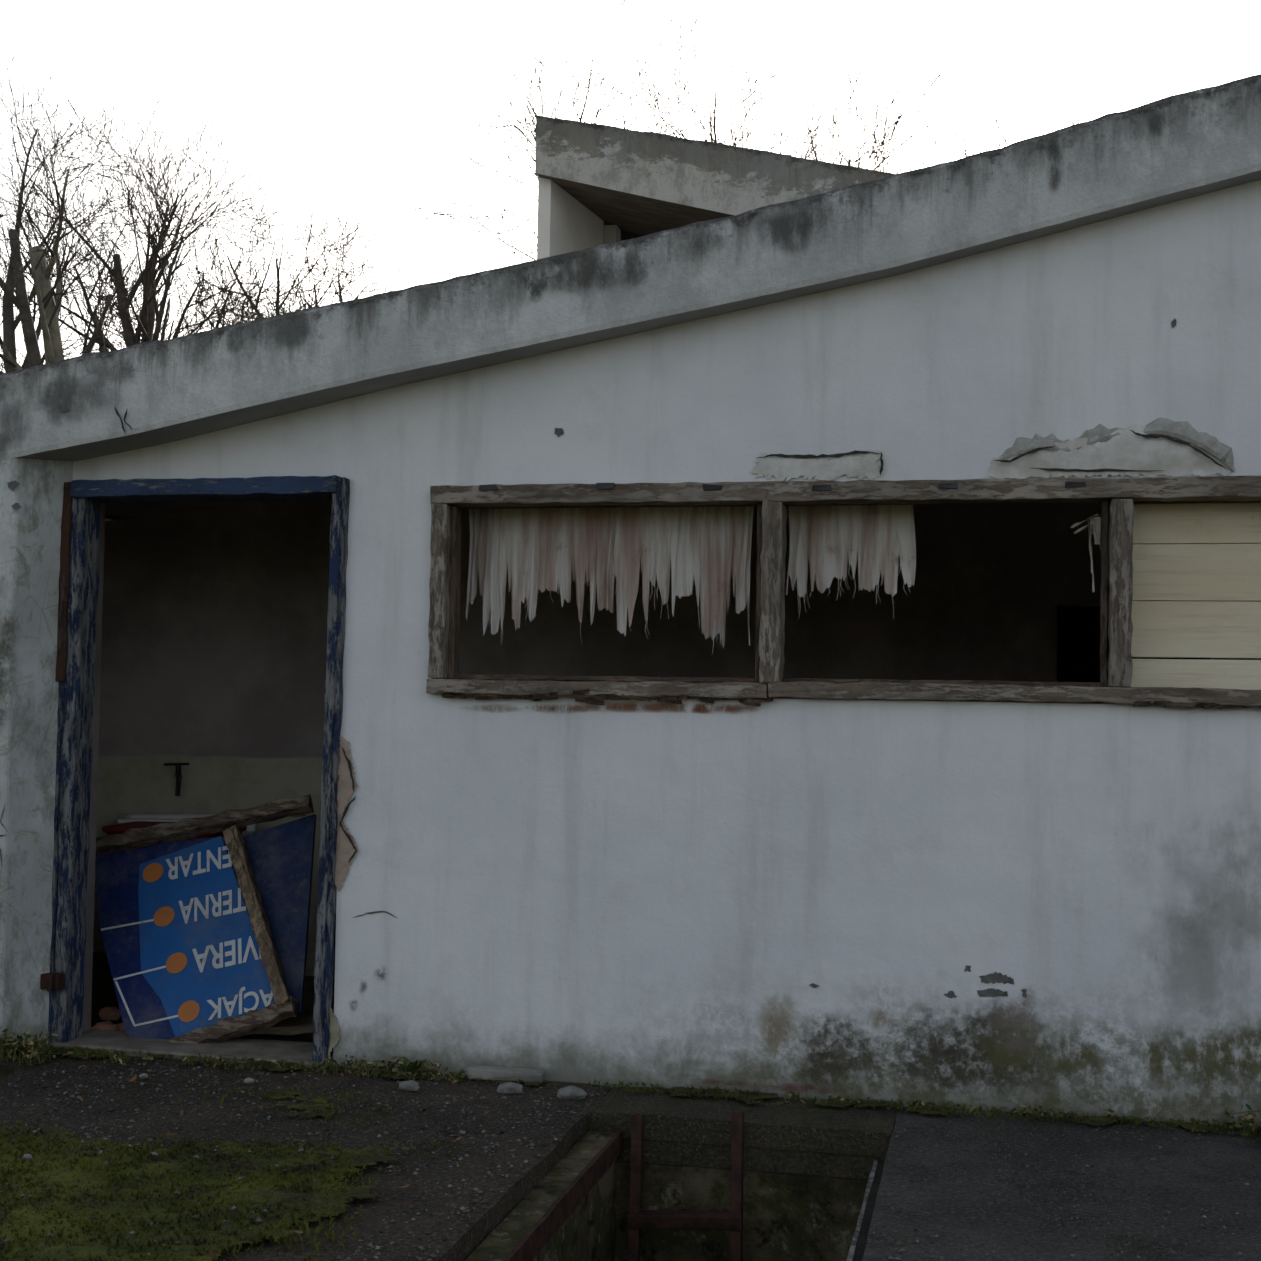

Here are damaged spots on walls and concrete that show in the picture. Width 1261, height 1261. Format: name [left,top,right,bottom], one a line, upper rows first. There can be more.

leakage [1037,142,1059,188]
crack [0,805,8,864]
spalling [335,737,358,891]
peeling [964,965,1027,998]
leakage [907,1048,965,1085]
leakage [1151,1046,1231,1079]